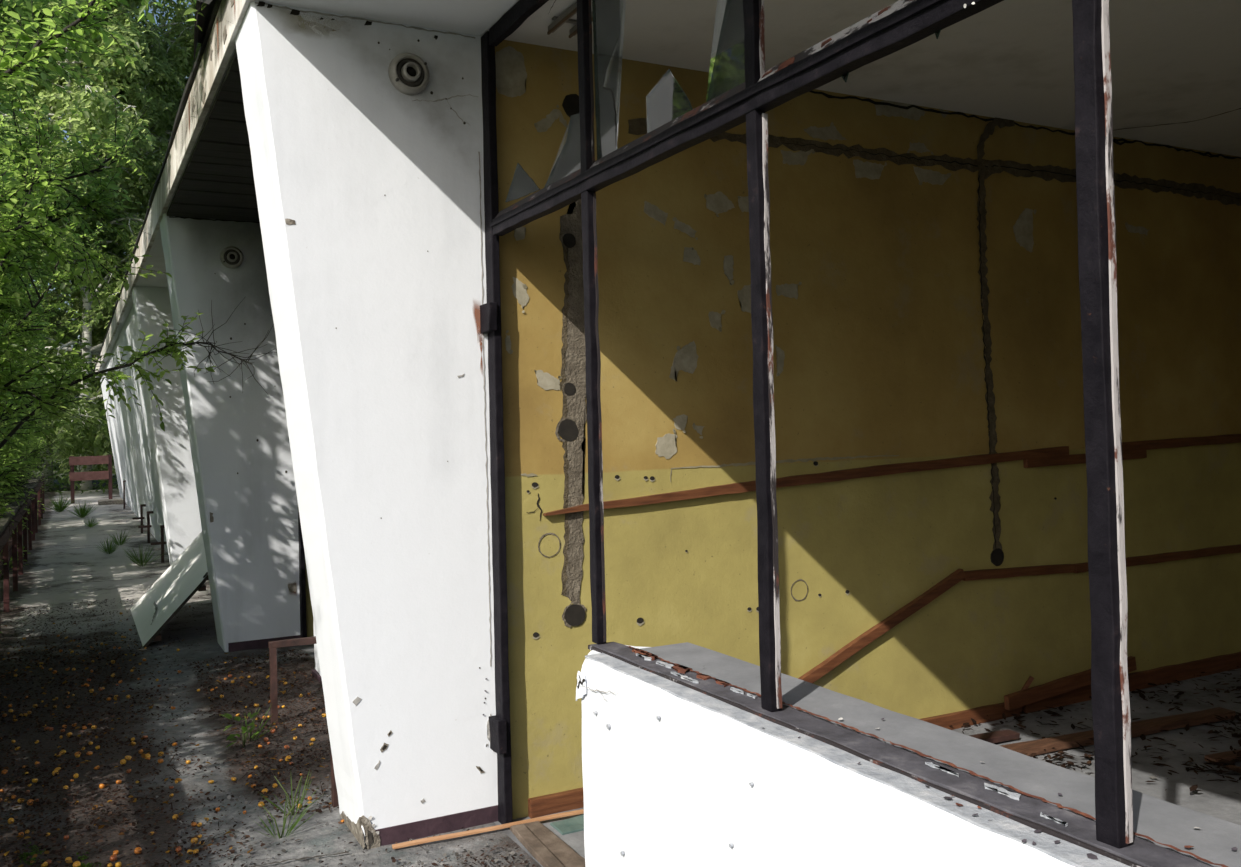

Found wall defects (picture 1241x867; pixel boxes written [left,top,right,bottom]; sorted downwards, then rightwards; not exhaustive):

peeling [669,341,698,381]
peeling [655,414,705,459]
corrosion [629,646,761,696]
corrosion [782,701,1096,820]
corrosion [1133,832,1228,867]